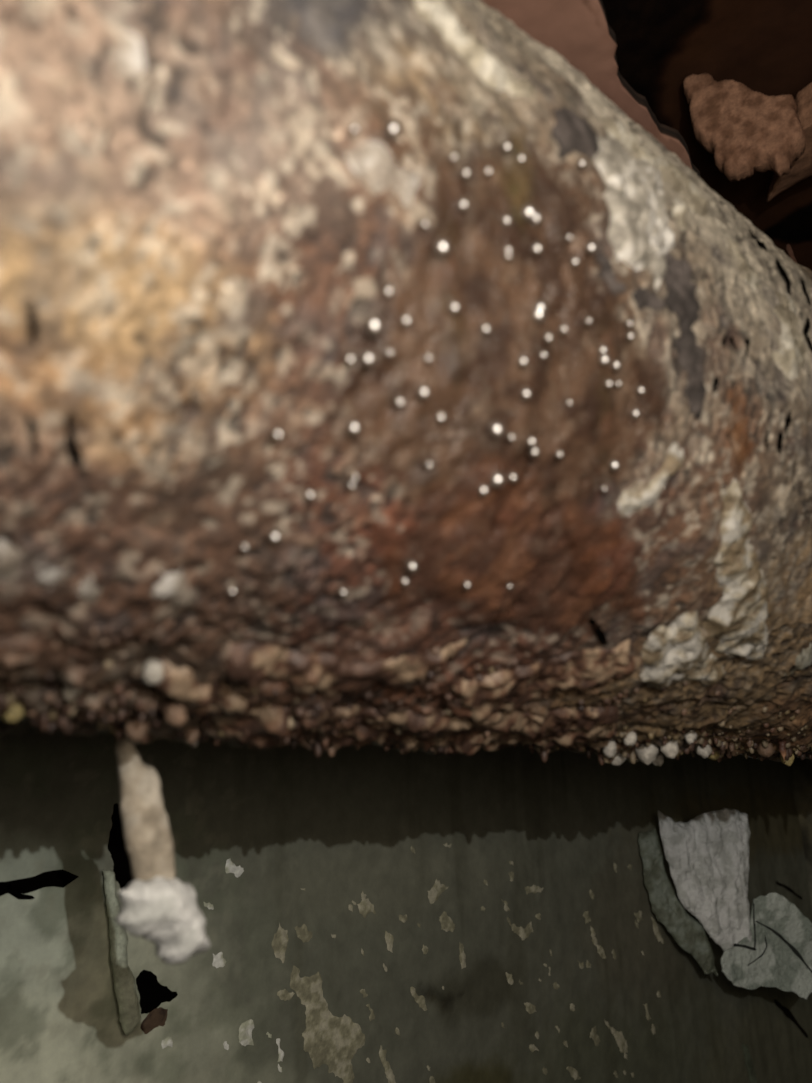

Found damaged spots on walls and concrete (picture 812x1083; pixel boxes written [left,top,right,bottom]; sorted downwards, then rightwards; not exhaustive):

leakage [413,0,538,100]
leakage [591,117,711,292]
leakage [345,136,667,510]
leakage [771,290,807,380]
efflorescence [616,443,685,517]
rust [382,460,640,628]
efflorescence [640,479,769,690]
peeling [428,879,448,904]
peeling [439,911,466,969]
peeling [501,899,541,940]
peeling [271,923,396,1083]
peeling [590,1019,634,1078]